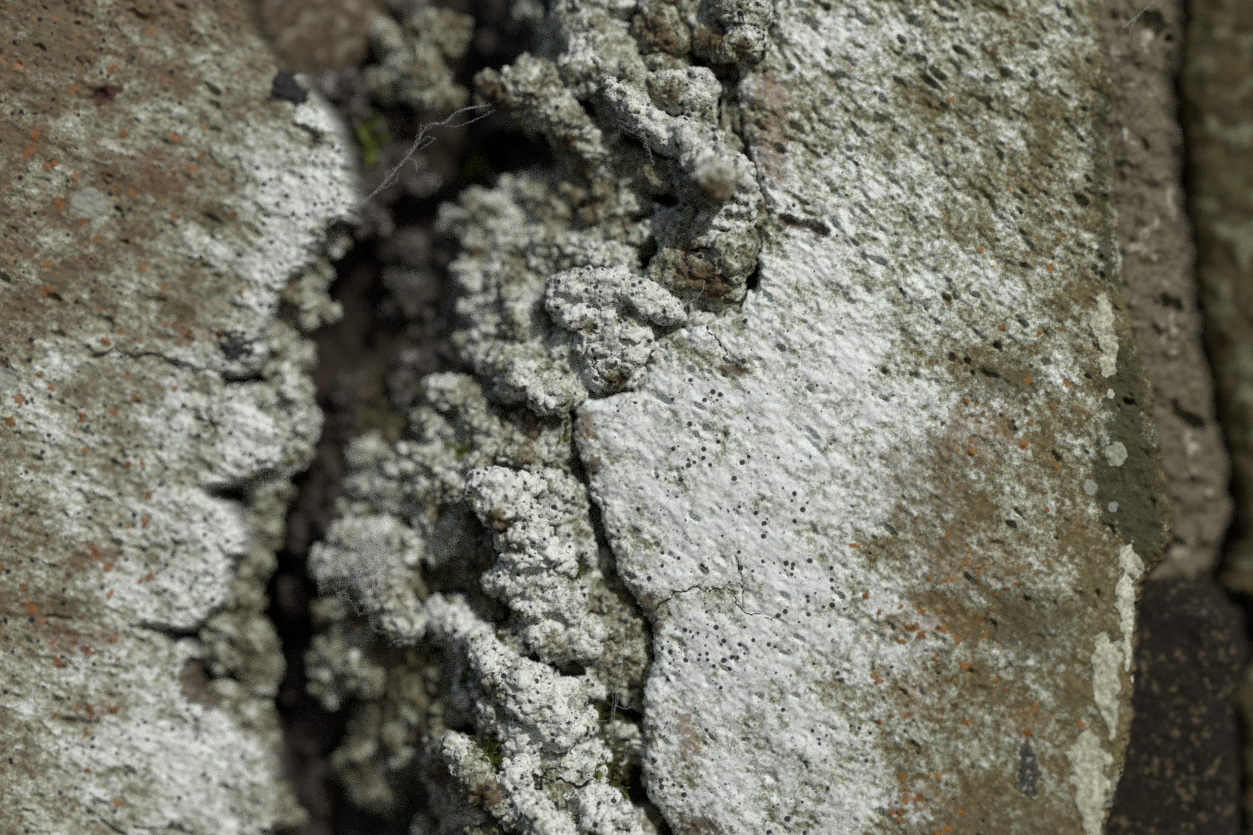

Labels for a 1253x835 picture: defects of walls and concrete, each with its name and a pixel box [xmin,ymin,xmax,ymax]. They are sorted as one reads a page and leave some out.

crack [88,347,229,376]
crack [196,406,227,438]
damp [583,455,603,475]
damp [618,566,665,638]
peeling [1063,541,1145,835]
damp [671,713,702,768]
damp [671,803,733,835]